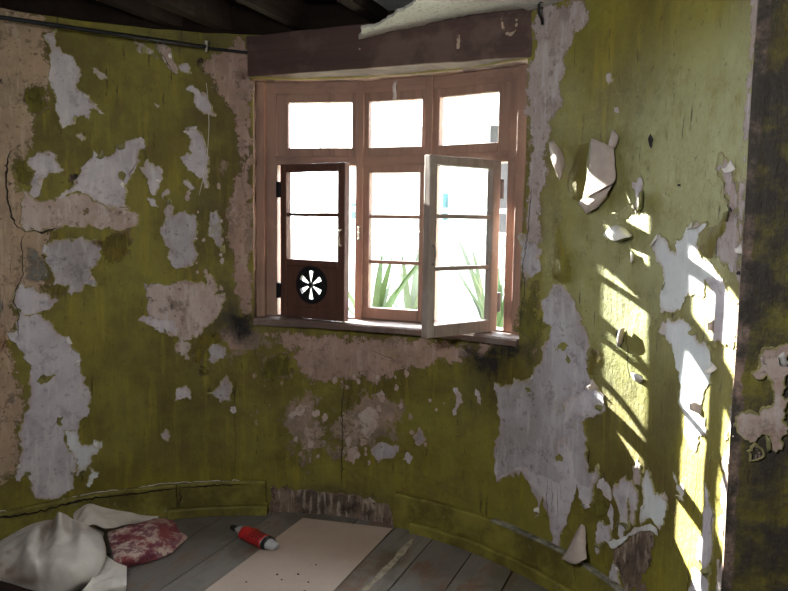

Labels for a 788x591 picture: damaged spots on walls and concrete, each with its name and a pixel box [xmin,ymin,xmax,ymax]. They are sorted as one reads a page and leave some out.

flaking render [0,8,255,500]
flaking render [256,329,494,474]
flaking render [518,0,590,313]
peeling [493,283,685,591]
peeling [650,151,745,453]
flaking render [742,0,758,143]